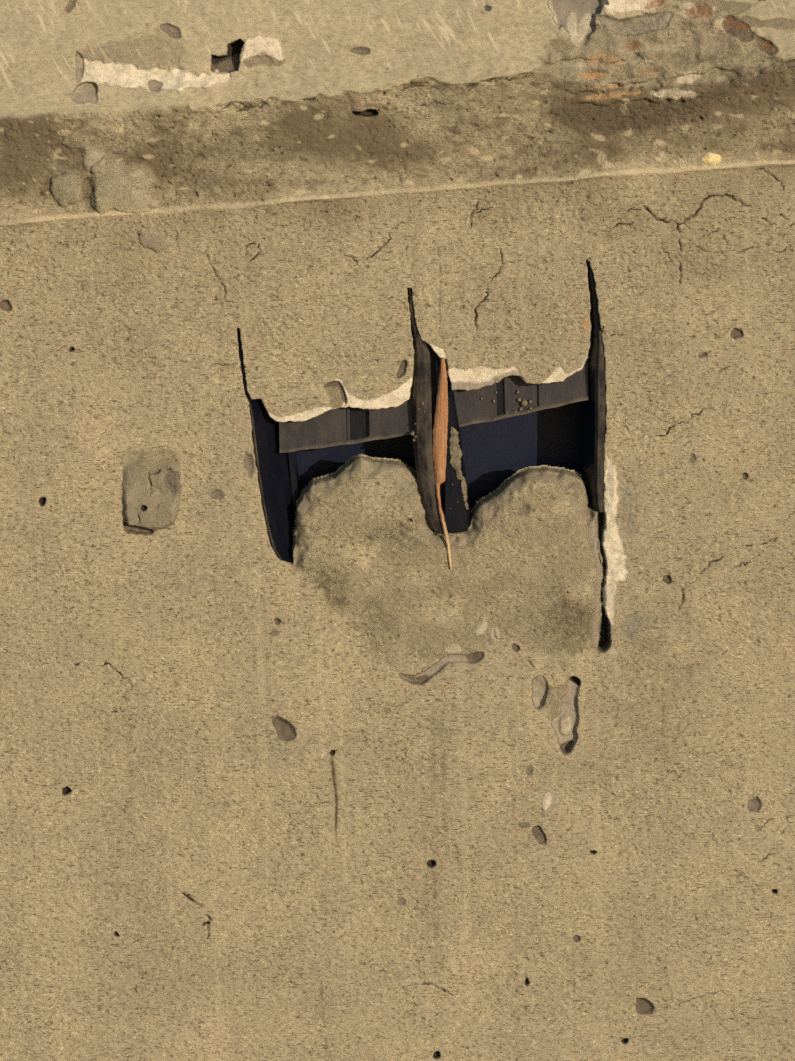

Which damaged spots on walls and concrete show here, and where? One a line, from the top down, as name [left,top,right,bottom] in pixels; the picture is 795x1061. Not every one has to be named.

spalling [71,52,244,104]
rust [586,91,641,100]
spalling [542,0,795,103]
crack [614,194,794,283]
spalling [429,337,591,391]
spalling [263,376,414,422]
spalling [602,456,629,625]
peeling [474,621,501,642]
spalling [399,644,484,683]
spalling [532,675,580,752]